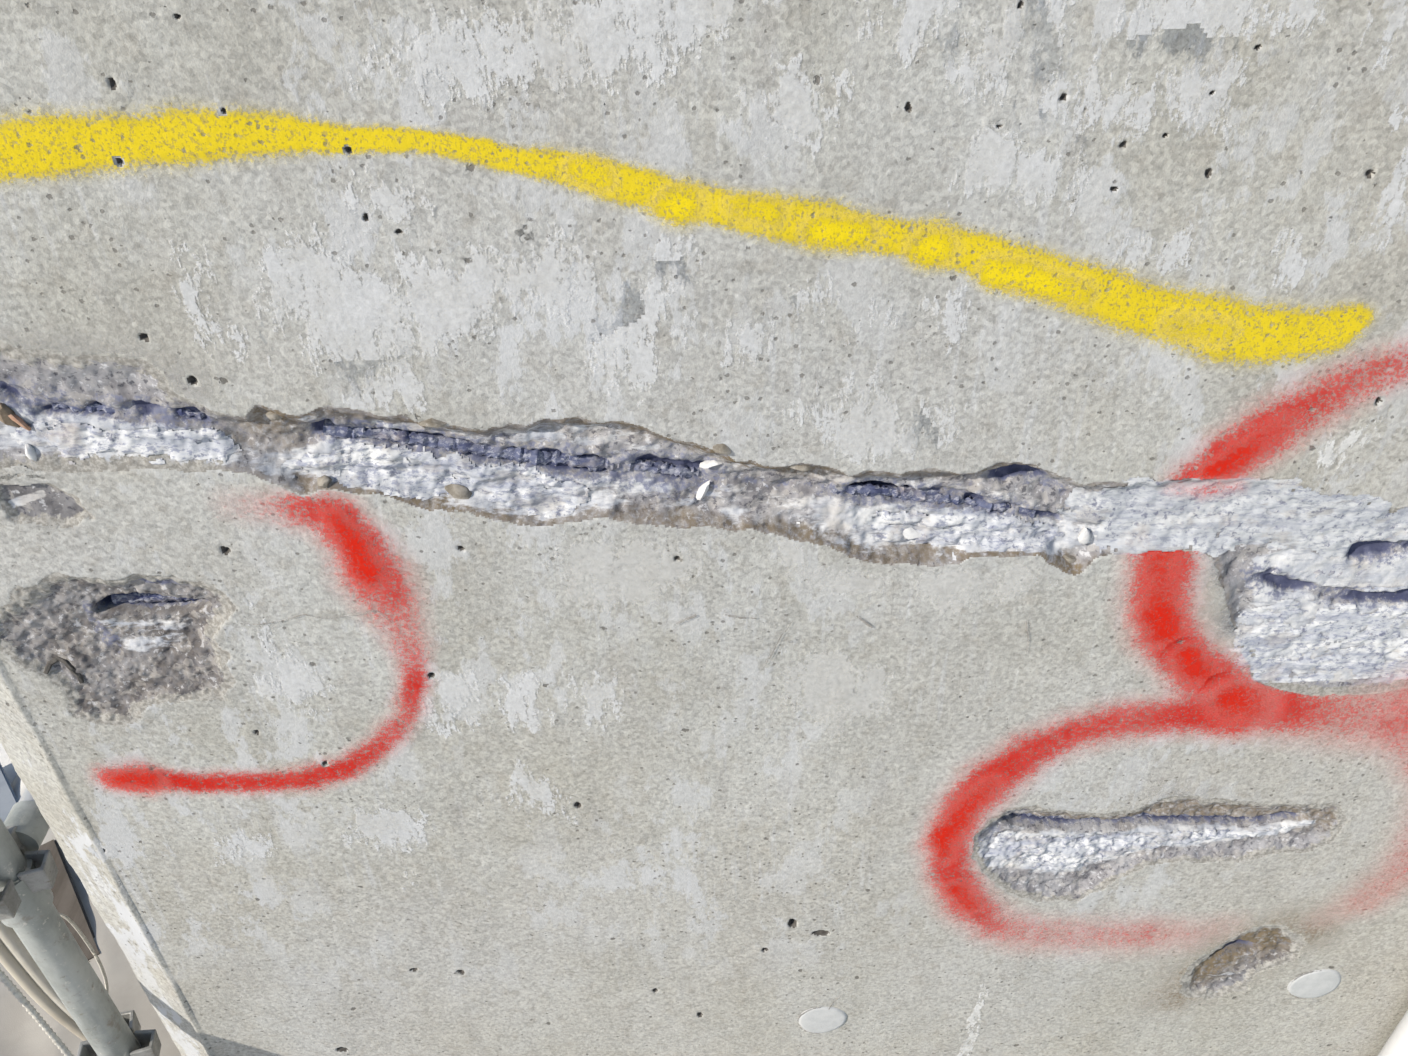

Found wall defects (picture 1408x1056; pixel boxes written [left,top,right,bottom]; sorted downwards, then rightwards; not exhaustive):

peeling [764,53,855,159]
peeling [1388,106,1408,132]
peeling [343,167,434,233]
peeling [947,125,1092,216]
peeling [1371,147,1408,251]
spalling [0,222,1408,702]
spalling [0,562,335,737]
peeling [420,671,553,739]
peeling [341,807,429,853]
peeling [505,760,577,826]
spalling [959,788,1355,907]
spalling [1170,921,1318,1005]